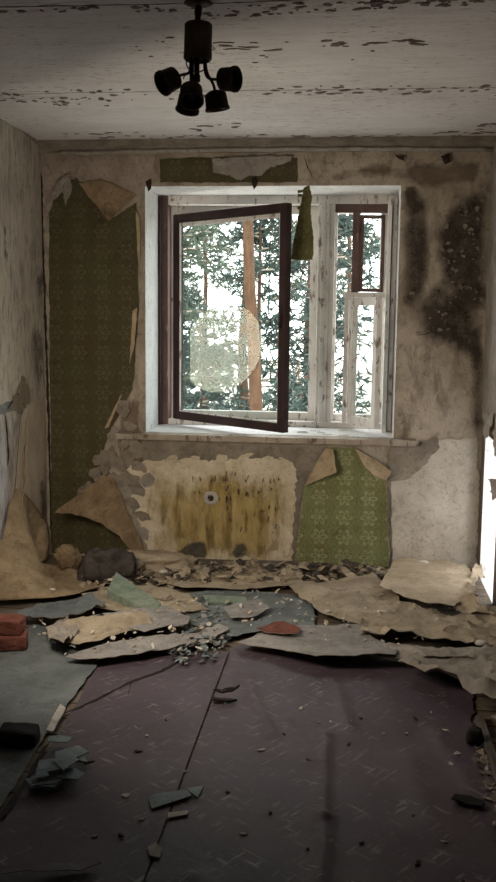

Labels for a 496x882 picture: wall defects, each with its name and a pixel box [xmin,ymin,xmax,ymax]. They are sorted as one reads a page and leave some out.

peeling [249,1,343,17]
peeling [352,0,494,11]
peeling [212,42,289,63]
peeling [362,39,428,52]
peeling [0,88,131,107]
peeling [263,85,496,96]
peeling [163,123,276,139]
leakage [405,164,485,388]
flaking render [0,376,31,415]
peeling [78,400,328,561]
peeling [387,412,496,569]